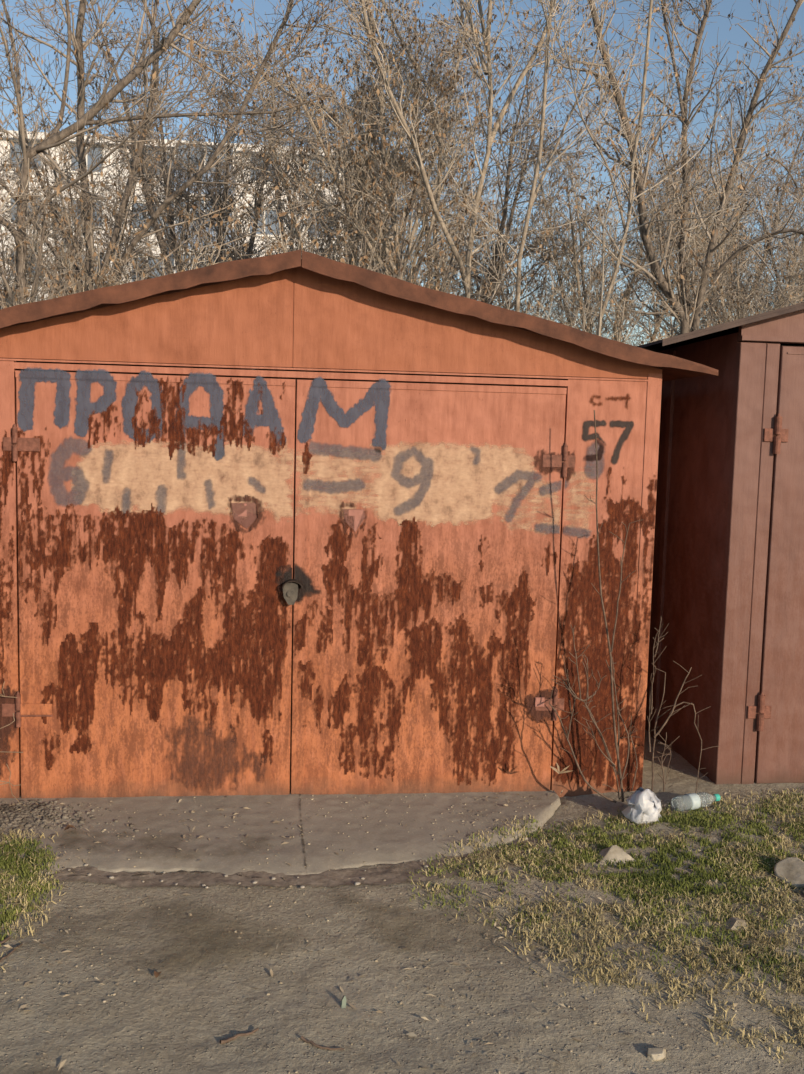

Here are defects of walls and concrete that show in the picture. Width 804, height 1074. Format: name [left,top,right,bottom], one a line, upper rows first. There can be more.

rust [229,495,264,532]
rust [0,687,17,775]